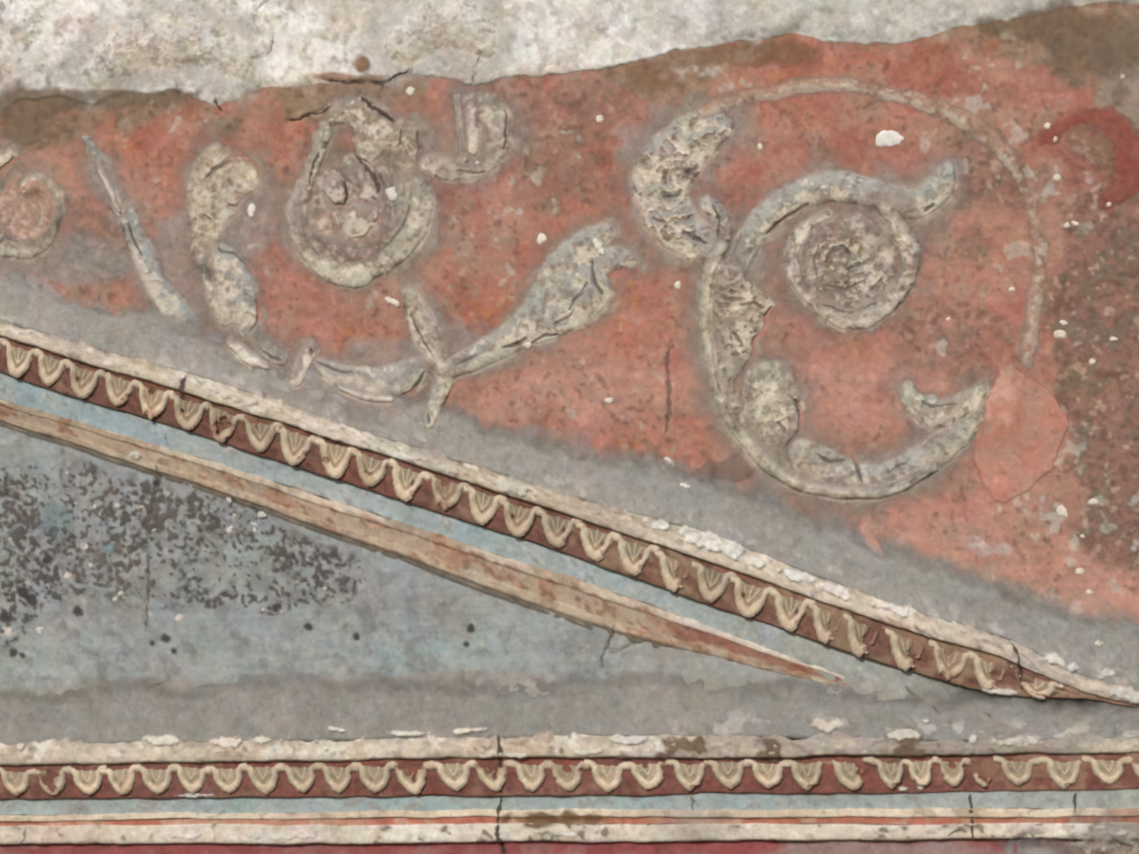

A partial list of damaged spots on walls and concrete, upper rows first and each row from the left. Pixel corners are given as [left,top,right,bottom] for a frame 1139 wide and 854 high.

crack [495,735,506,854]